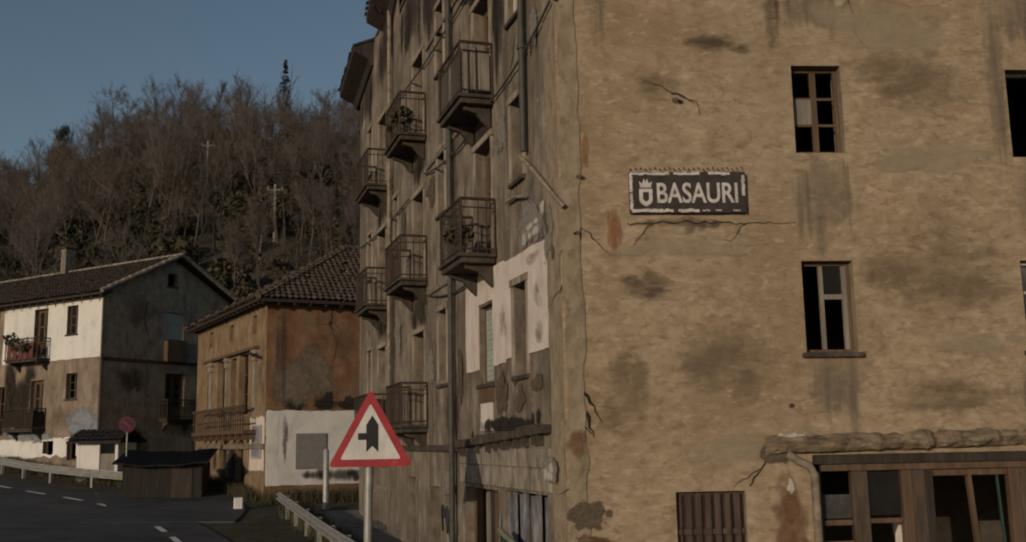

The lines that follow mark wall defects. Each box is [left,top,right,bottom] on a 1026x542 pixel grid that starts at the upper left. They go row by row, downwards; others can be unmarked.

crack [646,81,700,115]
flaking render [518,193,554,264]
corrosion [608,215,622,248]
crack [560,220,794,254]
crack [584,391,602,437]
spalling [566,501,613,542]